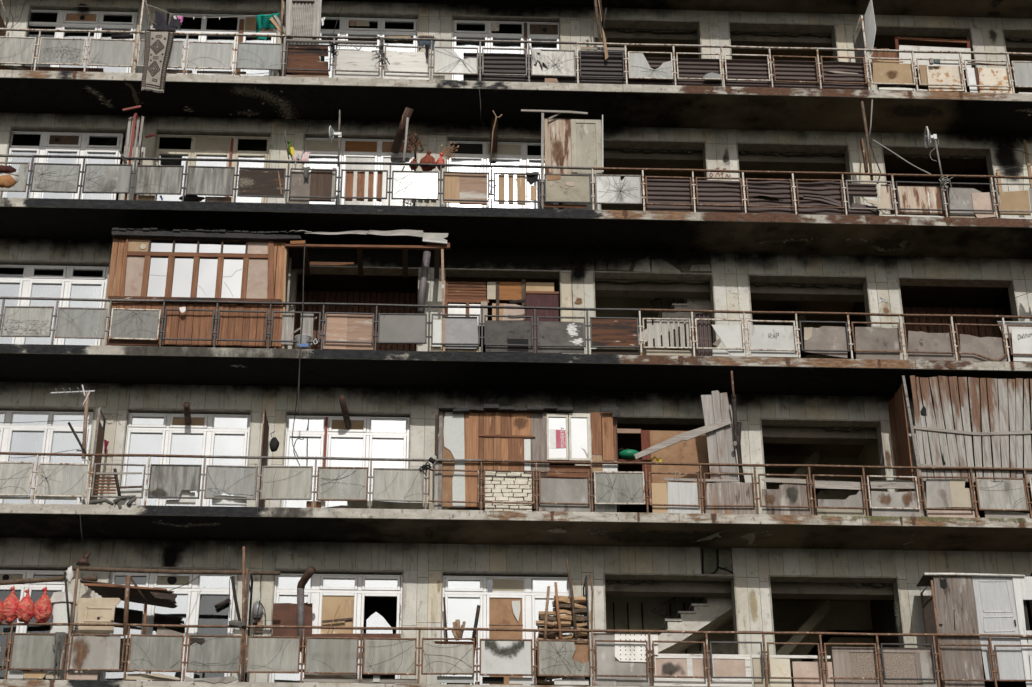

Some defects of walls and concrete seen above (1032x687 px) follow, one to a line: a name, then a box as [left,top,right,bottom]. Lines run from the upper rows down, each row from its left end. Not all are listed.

rust [604,210,1032,227]
rust [618,355,977,369]